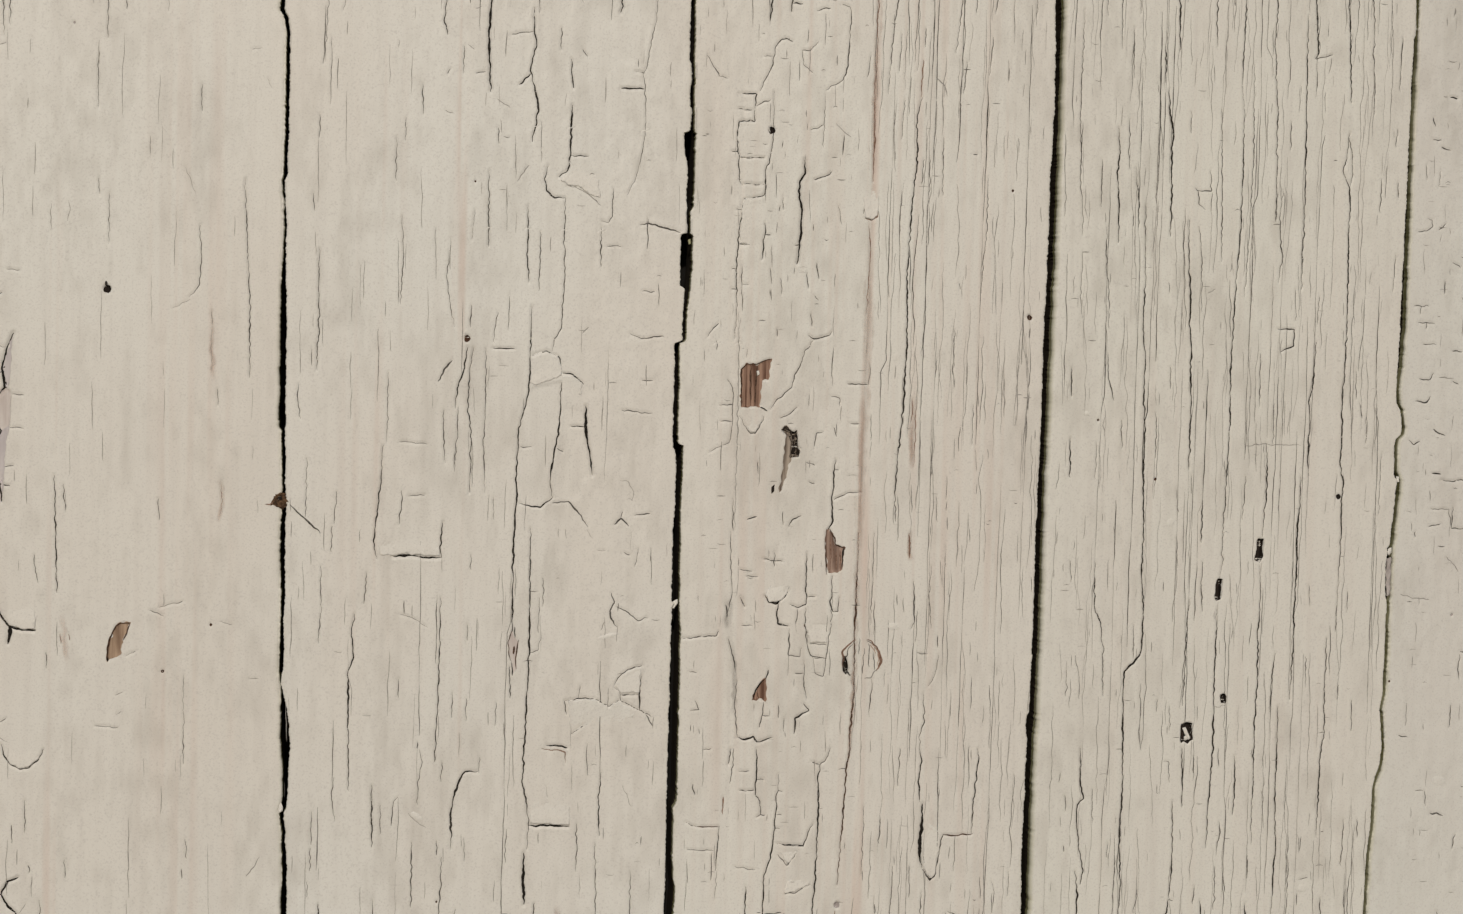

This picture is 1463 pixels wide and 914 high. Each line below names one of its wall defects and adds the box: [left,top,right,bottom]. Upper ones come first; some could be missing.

crack [93,0,128,113]
crack [2,145,110,237]
crack [150,92,253,417]
peeling [740,359,772,411]
crack [0,333,103,591]
peeling [771,425,800,494]
peeling [825,529,846,574]
crack [0,613,70,669]
peeling [106,621,131,662]
peeling [752,678,767,702]
crack [126,678,184,914]